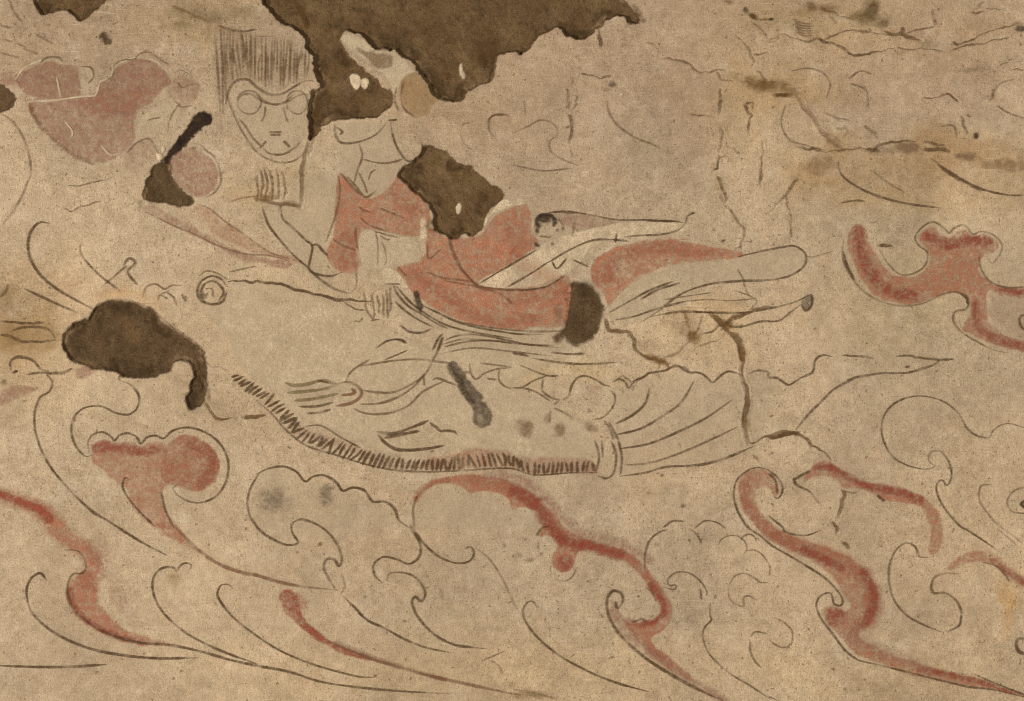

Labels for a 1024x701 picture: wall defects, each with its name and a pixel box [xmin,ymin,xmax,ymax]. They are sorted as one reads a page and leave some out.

crack [747,10,1010,79]
peeling [339,74,369,95]
spalling [424,64,489,101]
spalling [156,112,212,170]
crack [669,58,763,249]
crack [803,93,983,191]
crack [605,319,669,385]
crack [687,306,831,460]